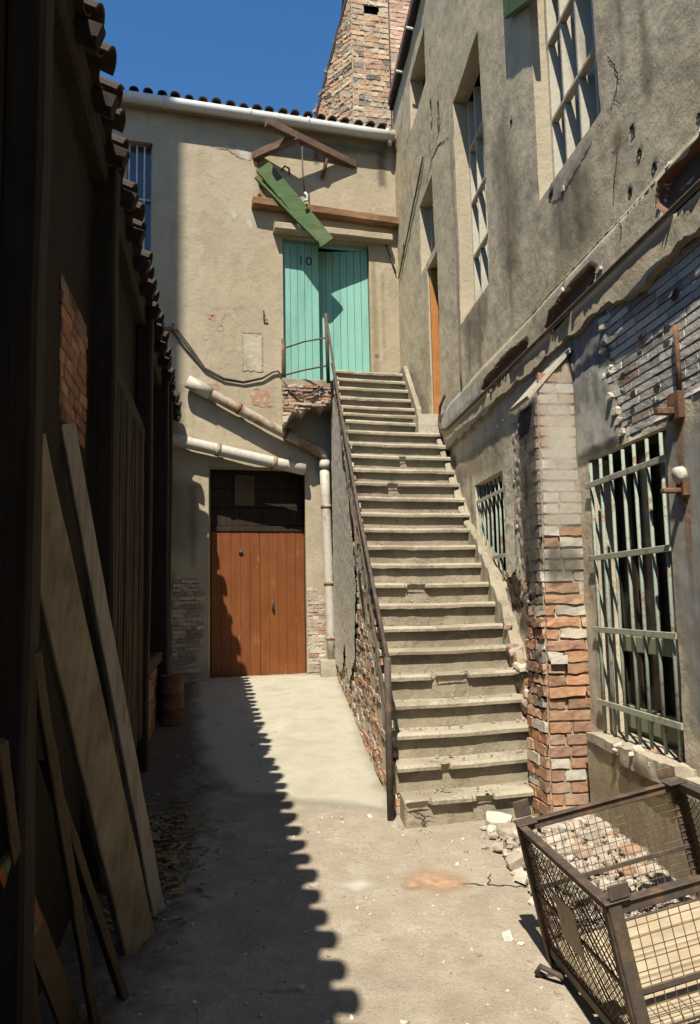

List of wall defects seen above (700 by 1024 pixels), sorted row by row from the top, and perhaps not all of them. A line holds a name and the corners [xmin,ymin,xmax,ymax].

crack [607,57,623,111]
flaking render [598,230,700,437]
flaking render [172,572,204,682]
flaking render [307,398,362,682]